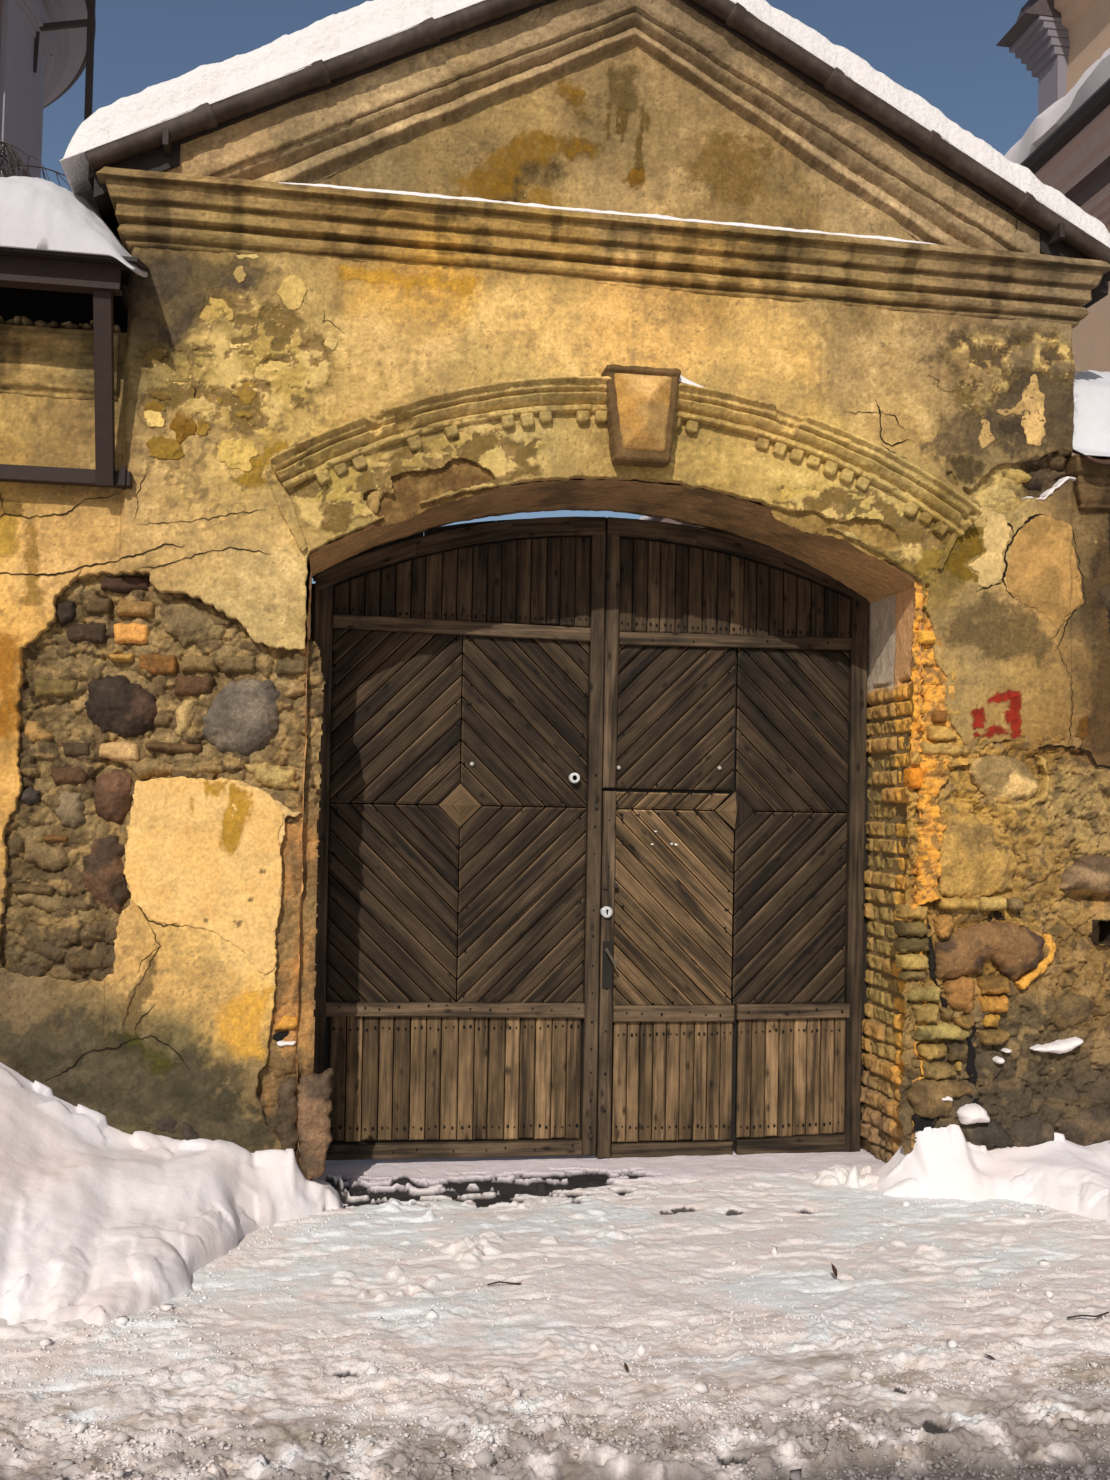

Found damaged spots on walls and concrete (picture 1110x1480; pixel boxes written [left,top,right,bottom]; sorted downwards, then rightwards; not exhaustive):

crack [0,467,263,584]
peeling [139,254,338,472]
peeling [288,428,550,533]
crack [847,399,911,458]
peeling [944,328,1075,588]
crack [976,514,1110,768]
flaking render [0,498,333,1181]
flaking render [771,485,1110,1155]
crack [45,906,189,1081]